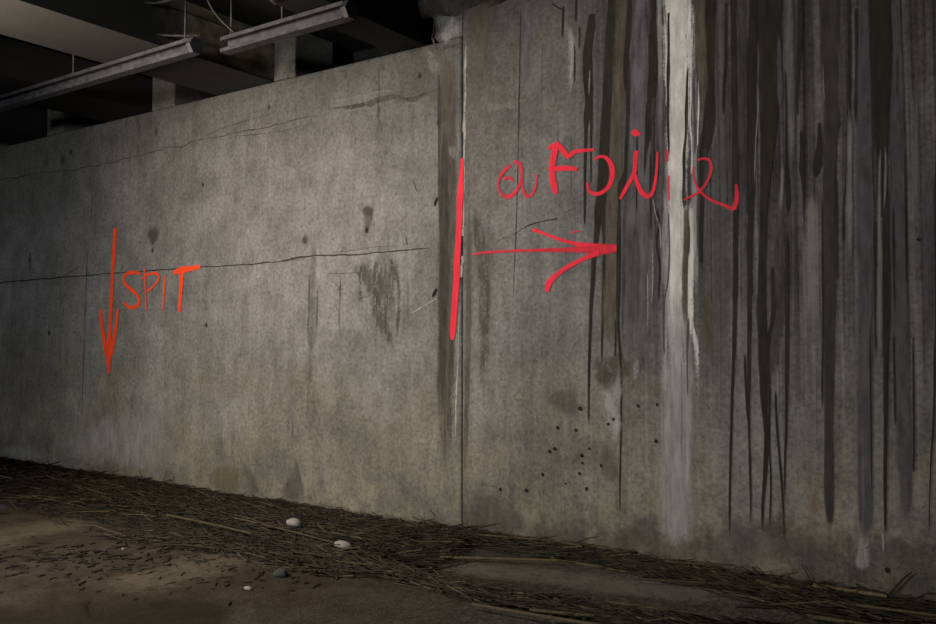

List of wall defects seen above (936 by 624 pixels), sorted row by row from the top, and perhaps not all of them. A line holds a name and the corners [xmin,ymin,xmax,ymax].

crack [0,267,177,283]
crack [200,246,426,299]
water stain [358,259,401,341]
water stain [437,64,456,449]
water stain [464,218,489,443]
water stain [552,0,936,566]